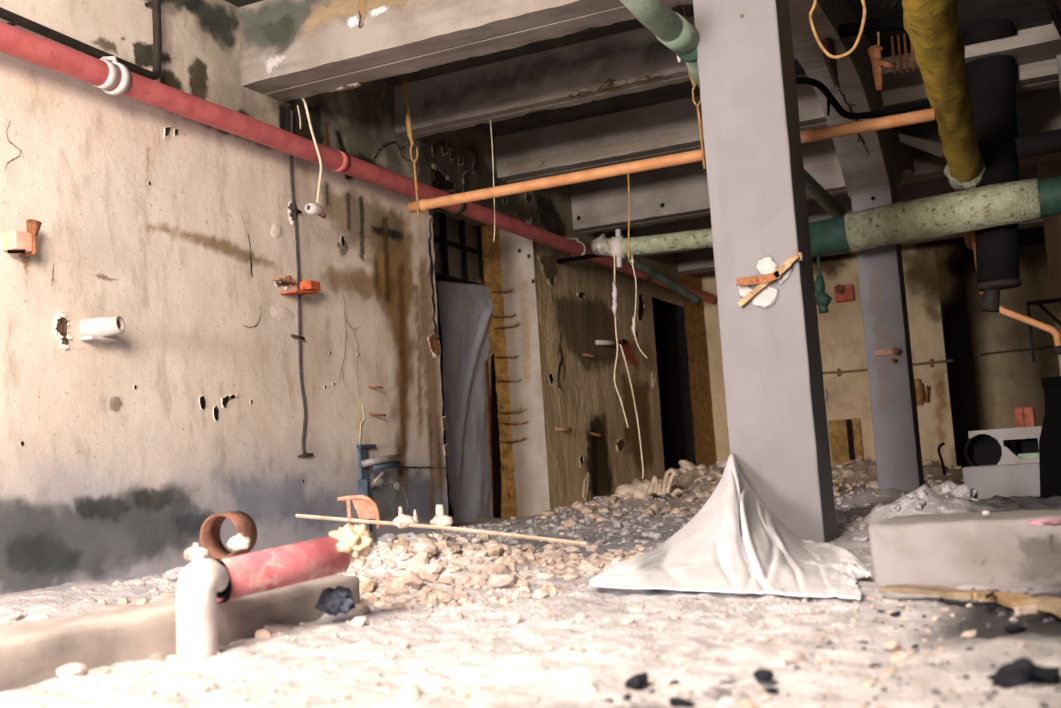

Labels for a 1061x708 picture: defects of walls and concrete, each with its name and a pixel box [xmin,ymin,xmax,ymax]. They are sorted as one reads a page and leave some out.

water stain [147,0,404,73]
water stain [94,38,208,100]
water stain [279,105,380,167]
spalling [431,140,470,194]
water stain [322,184,403,259]
flaking render [52,312,72,351]
rust [329,217,421,481]
spalling [199,393,238,422]
water stain [234,480,332,526]
water stain [0,487,207,592]